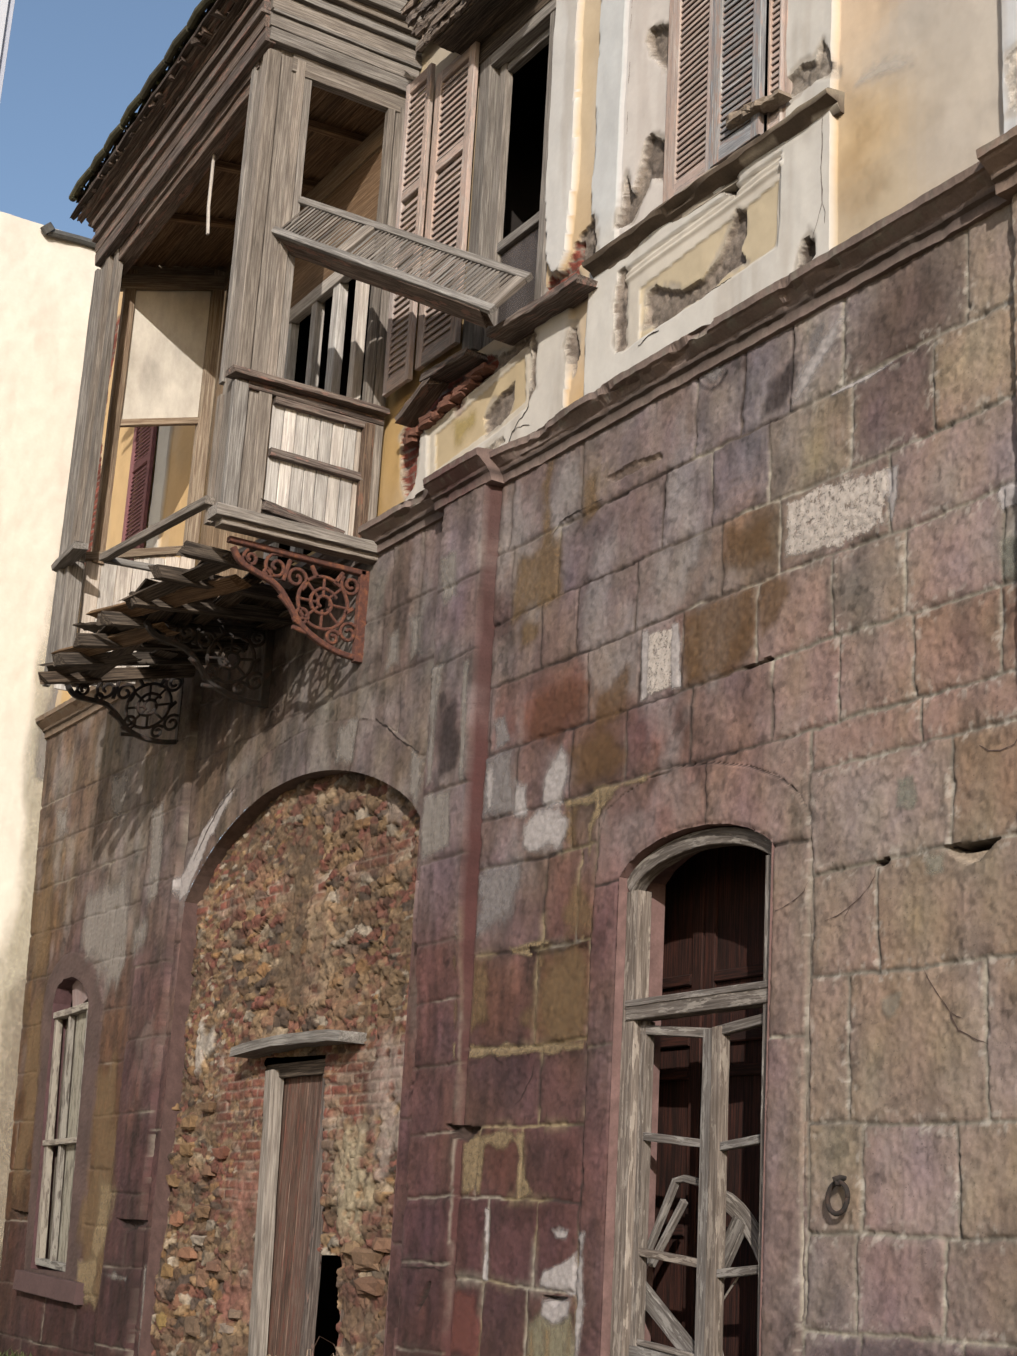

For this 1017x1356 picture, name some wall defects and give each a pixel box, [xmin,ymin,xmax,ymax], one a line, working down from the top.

flaking render [645,23,669,71]
flaking render [788,40,839,98]
flaking render [614,132,665,229]
crack [812,119,825,239]
flaking render [546,213,597,290]
flaking render [644,185,747,330]
flaking render [797,235,816,269]
flaking render [613,265,629,354]
flaking render [564,327,581,375]
flaking render [399,330,538,499]
spalling [944,837,1001,866]